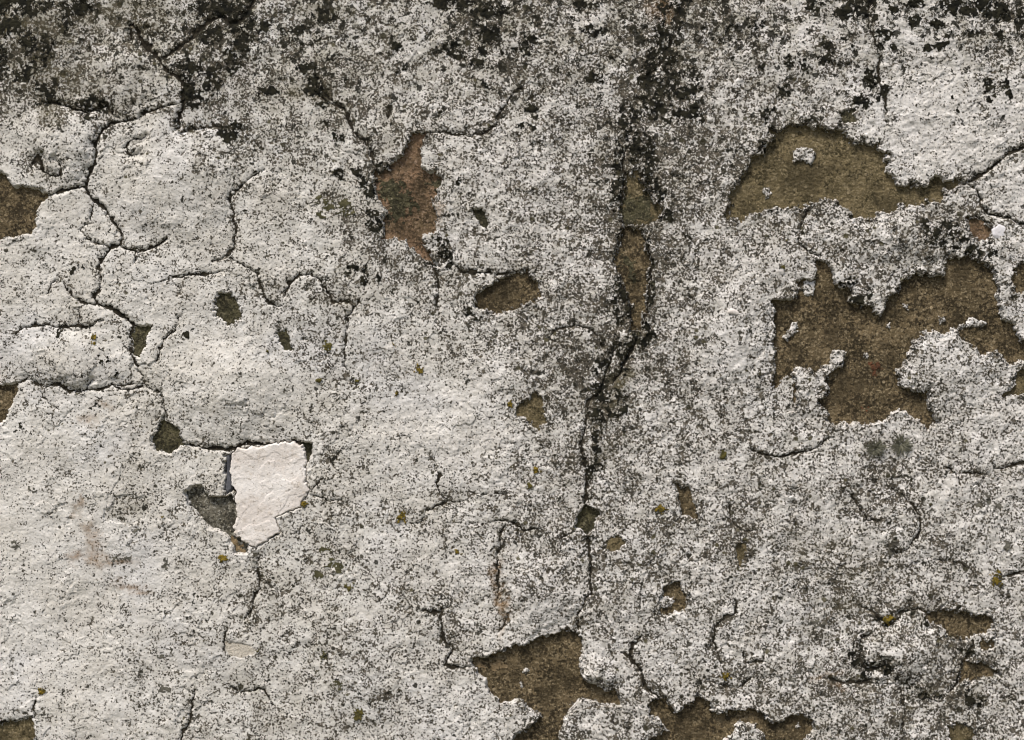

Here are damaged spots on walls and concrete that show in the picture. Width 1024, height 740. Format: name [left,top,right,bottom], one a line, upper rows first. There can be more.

spalling [0,170,50,240]
crack [15,0,256,417]
crack [167,171,360,370]
spalling [371,130,444,272]
crack [548,150,653,507]
spalling [724,109,981,223]
spalling [766,215,1024,430]
crack [184,439,302,452]
crack [410,458,593,630]
crack [422,601,470,669]
spalling [469,627,623,740]
spalling [647,692,814,740]